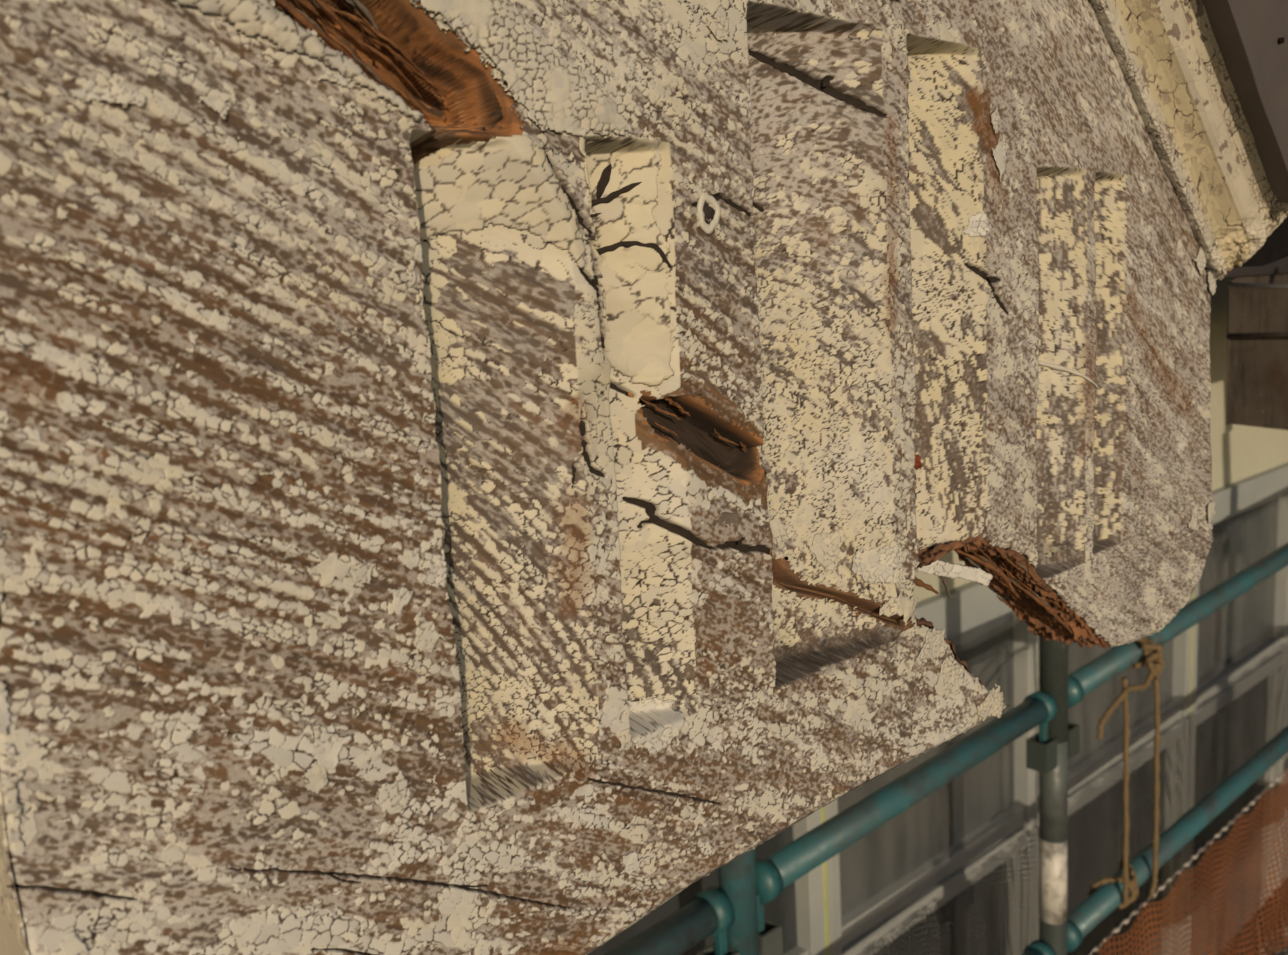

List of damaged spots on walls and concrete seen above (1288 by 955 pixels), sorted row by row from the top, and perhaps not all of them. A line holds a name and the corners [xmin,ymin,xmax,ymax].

crack [748,50,887,117]
spalling [176,0,676,386]
crack [543,147,592,234]
crack [579,268,605,348]
crack [572,410,770,554]
peeling [388,547,447,653]
spalling [770,518,1113,722]
peeling [302,724,352,794]
peeling [376,770,412,817]
peeling [618,696,685,755]
crack [588,778,720,805]
crack [7,885,137,900]